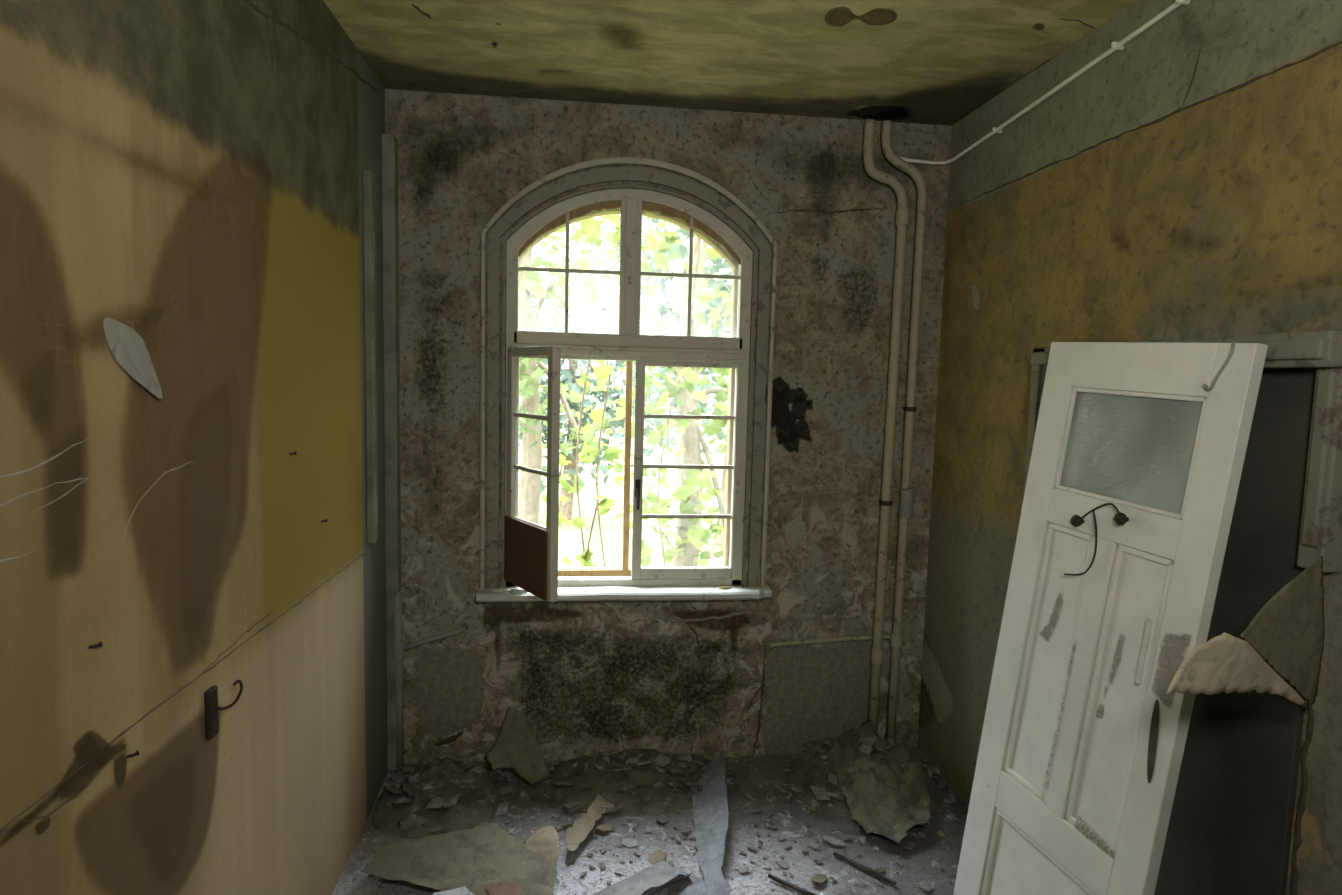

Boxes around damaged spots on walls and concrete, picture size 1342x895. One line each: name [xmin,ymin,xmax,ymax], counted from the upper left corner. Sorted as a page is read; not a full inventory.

damp [825,7,897,27]
damp [765,376,813,453]
damp [1318,571,1342,895]